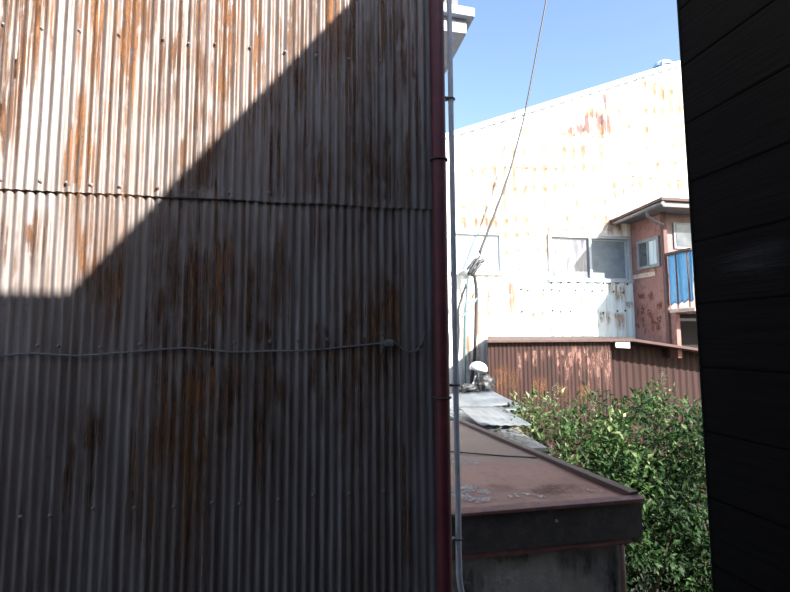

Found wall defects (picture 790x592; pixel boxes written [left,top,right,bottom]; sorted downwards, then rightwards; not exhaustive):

corrosion [63,0,157,222]
corrosion [160,0,239,196]
corrosion [249,0,281,111]
corrosion [461,93,688,259]
corrosion [636,80,684,152]
corrosion [78,222,122,325]
corrosion [145,183,244,552]